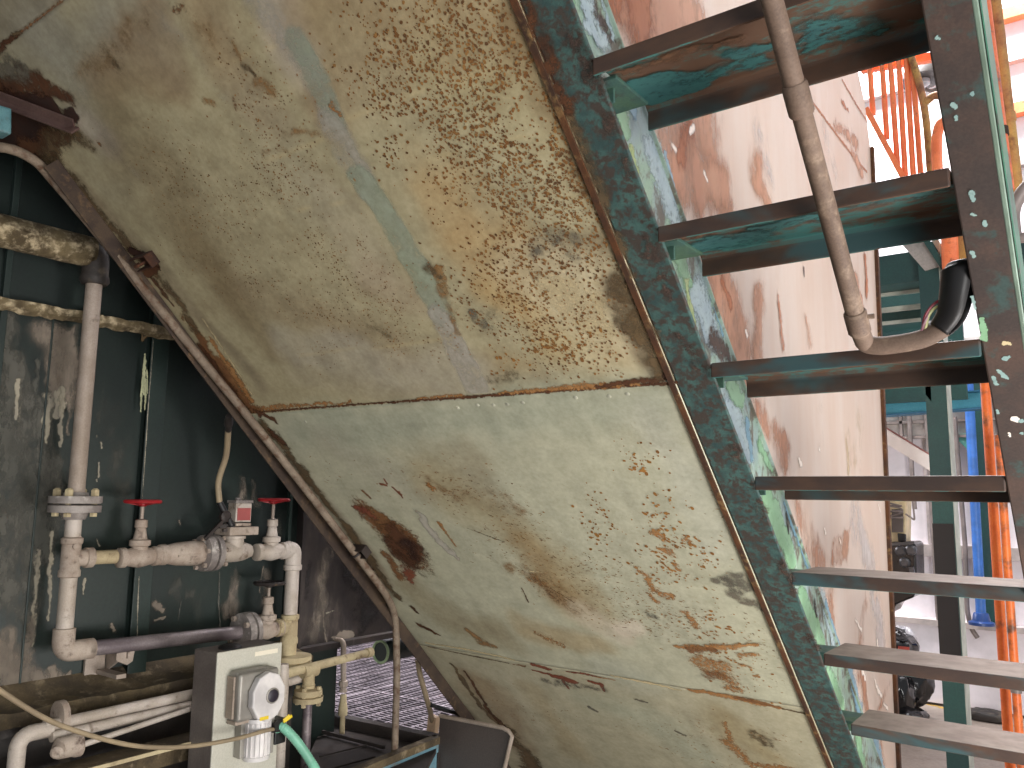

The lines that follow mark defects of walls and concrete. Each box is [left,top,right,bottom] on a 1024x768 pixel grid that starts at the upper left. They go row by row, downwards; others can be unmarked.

rust [0,91,79,139]
rust [66,0,678,425]
rust [755,401,790,474]
damp [0,311,79,686]
rust [352,490,433,585]
rust [379,439,806,715]
rust [812,530,849,567]
rust [449,663,577,768]